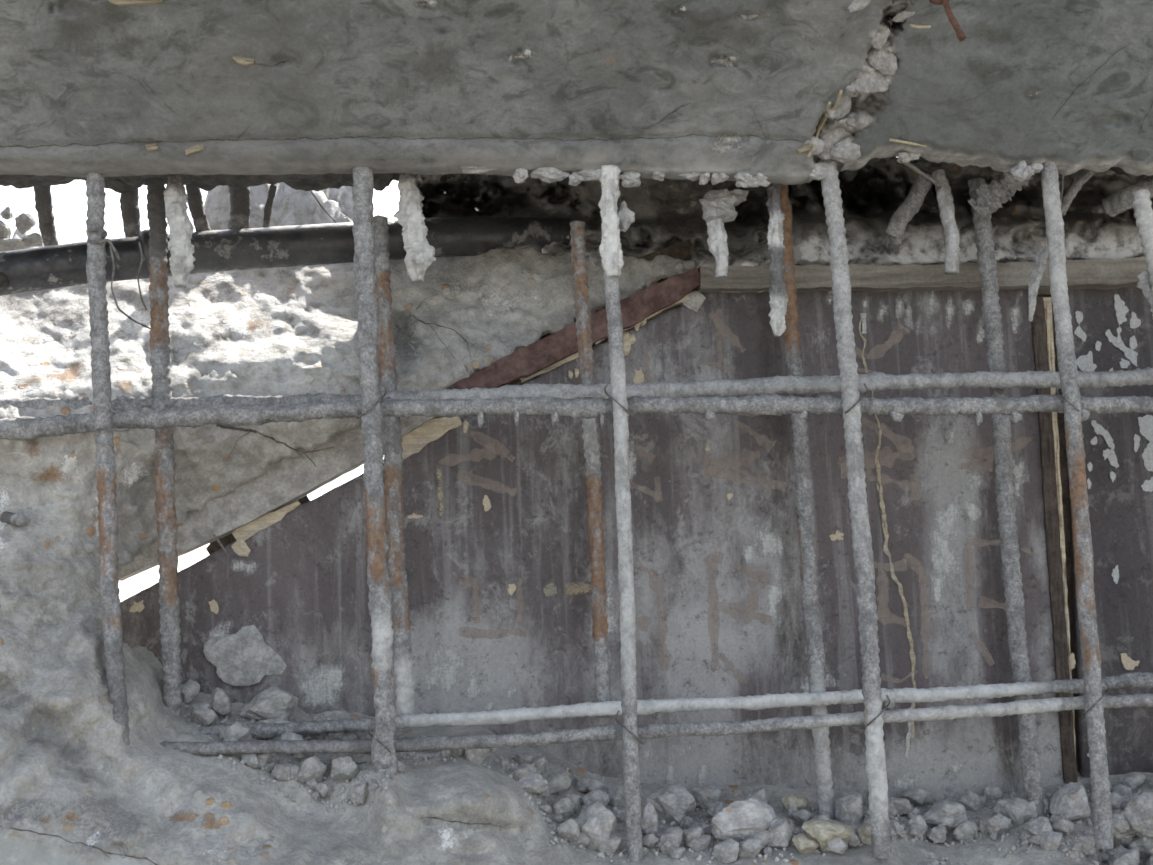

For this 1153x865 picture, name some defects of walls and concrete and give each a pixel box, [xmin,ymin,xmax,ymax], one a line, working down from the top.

crack [0,0,931,163]
crack [216,424,334,467]
spalling [0,166,643,862]
spalling [598,157,1153,859]
crack [0,825,157,865]